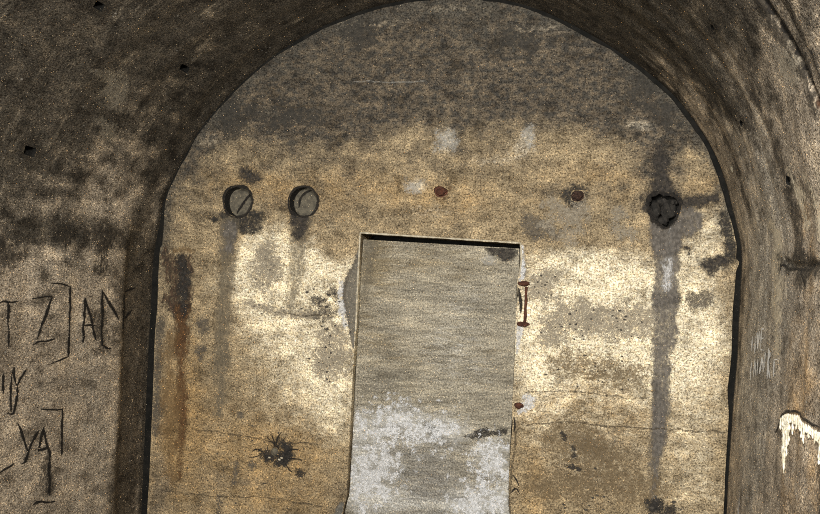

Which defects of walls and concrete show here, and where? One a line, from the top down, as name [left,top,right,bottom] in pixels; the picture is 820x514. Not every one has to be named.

crack [755,0,820,117]
corrosion [152,246,194,451]
water stain [640,140,719,514]
water stain [700,212,736,276]
water stain [767,216,785,358]
crack [776,250,820,288]
water stain [350,392,461,514]
water stain [445,424,510,514]
water stain [775,410,820,514]